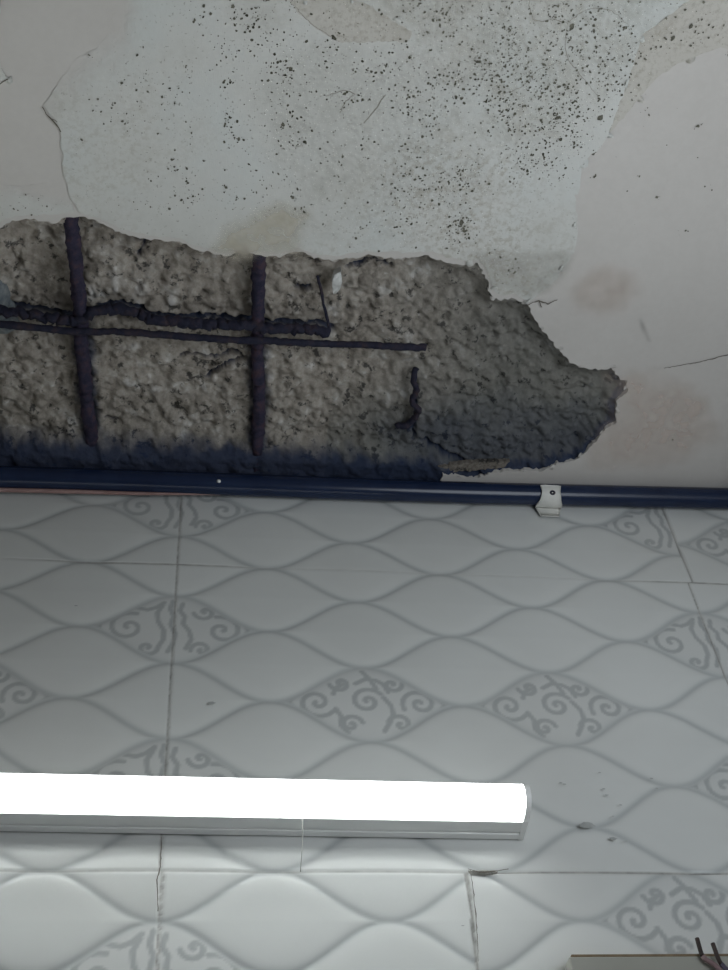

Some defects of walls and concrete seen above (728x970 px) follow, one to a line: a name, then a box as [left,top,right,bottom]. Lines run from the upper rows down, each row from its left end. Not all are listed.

peeling [0,0,728,481]
damp [189,0,724,254]
crack [155,837,163,911]